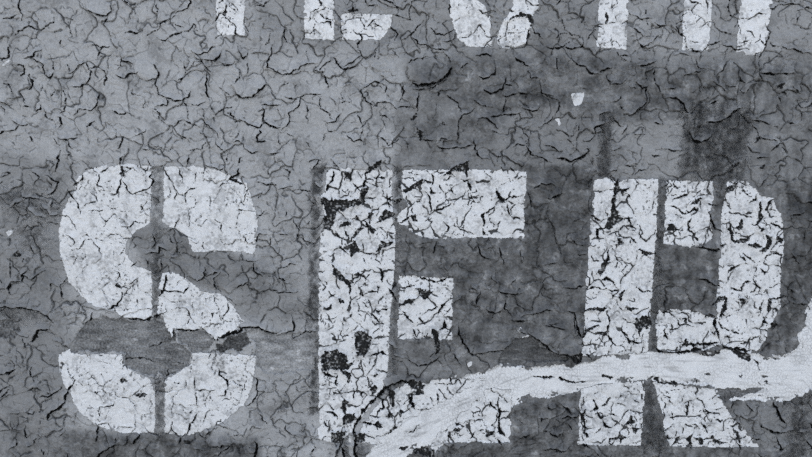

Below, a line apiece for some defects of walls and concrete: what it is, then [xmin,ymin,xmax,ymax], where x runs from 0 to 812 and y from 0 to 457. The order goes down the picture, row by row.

peeling [314,175,426,257]
crack [0,0,812,364]
peeling [605,178,631,245]
peeling [726,198,783,252]
crack [0,245,140,457]
peeling [329,260,364,296]
peeling [616,286,655,336]
crack [164,353,273,457]
peeling [327,371,427,457]
crack [324,341,439,457]
crack [466,376,639,457]
crack [659,382,812,457]